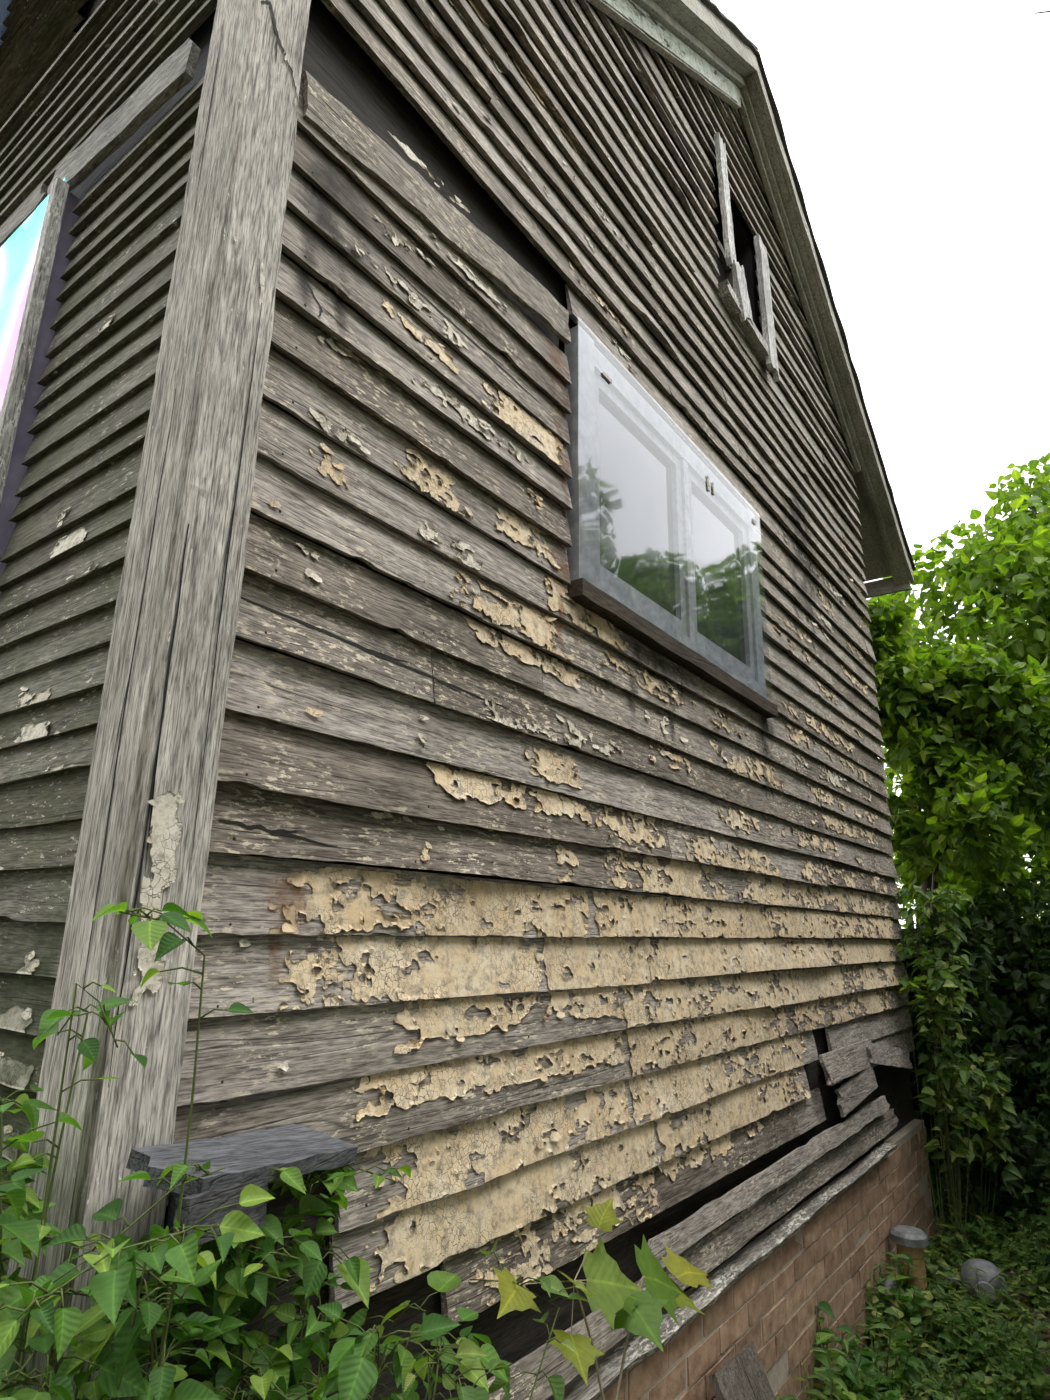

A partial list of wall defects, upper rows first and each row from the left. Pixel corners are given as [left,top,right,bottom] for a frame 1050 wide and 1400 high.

peeling [389,132,470,213]
peeling [375,215,508,313]
peeling [336,240,468,374]
peeling [318,336,361,363]
peeling [308,407,371,489]
peeling [394,449,473,520]
peeling [412,378,564,466]
peeling [50,507,88,558]
peeling [14,721,50,743]
peeling [16,686,51,708]
peeling [129,791,186,1006]
peeling [269,488,900,1306]